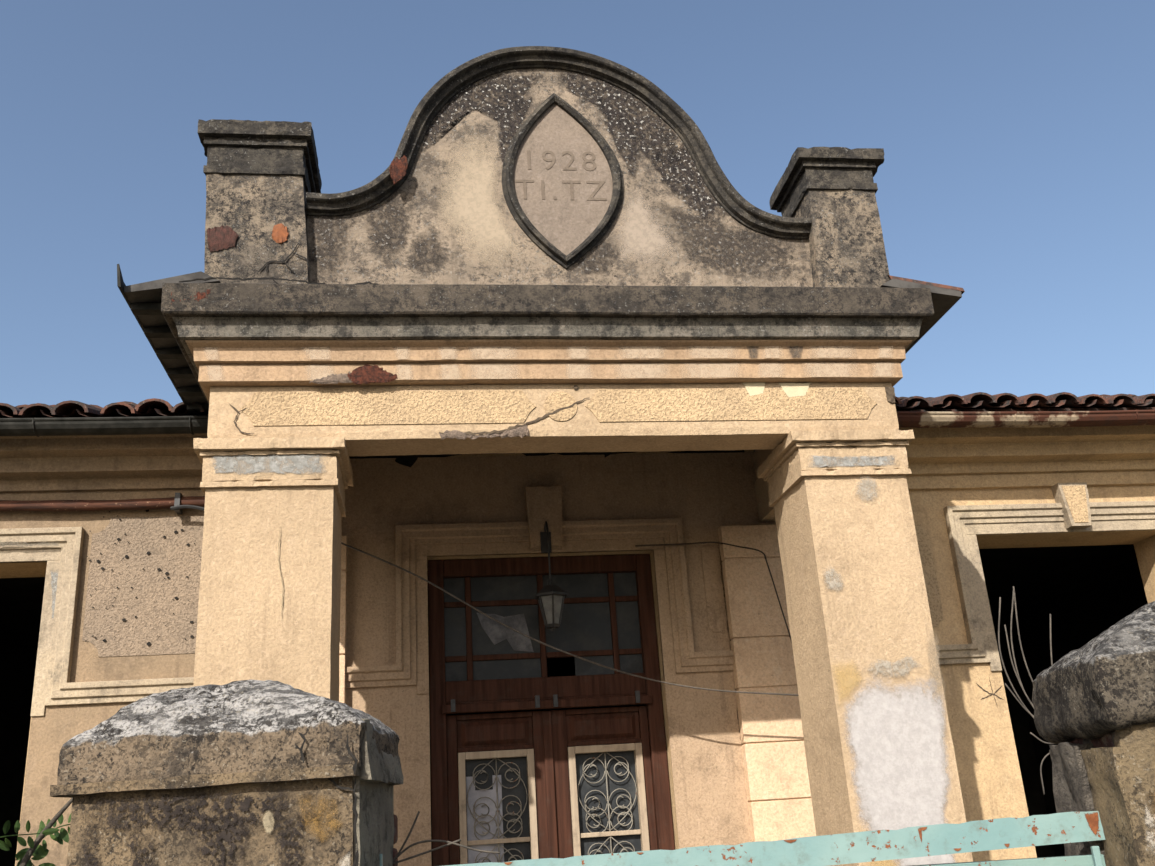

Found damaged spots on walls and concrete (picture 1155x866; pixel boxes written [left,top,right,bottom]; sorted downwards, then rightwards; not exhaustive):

spalling [389,156,408,185]
spalling [207,225,239,252]
spalling [272,223,289,244]
spalling [309,364,398,385]
crack [231,405,255,434]
crack [439,398,587,435]
peeling [213,454,324,475]
peeling [811,455,894,500]
water stain [83,792,338,866]